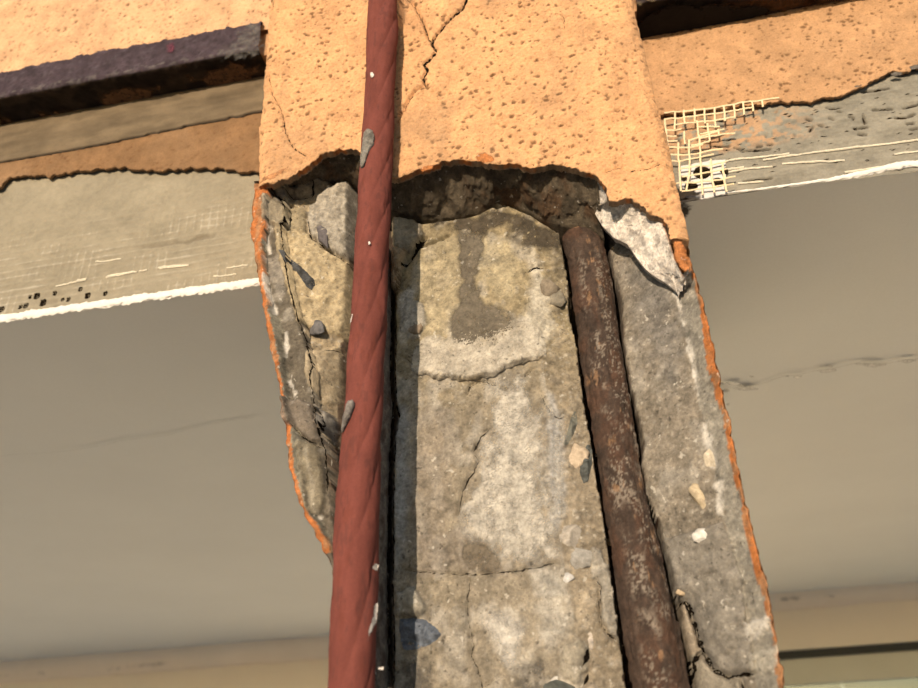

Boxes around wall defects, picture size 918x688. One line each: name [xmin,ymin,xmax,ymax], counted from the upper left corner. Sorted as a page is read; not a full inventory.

crack [398,0,468,122]
flaking render [661,69,918,195]
flaking render [0,153,360,575]
crack [392,326,554,687]
spalling [375,153,784,688]
crack [674,601,754,688]